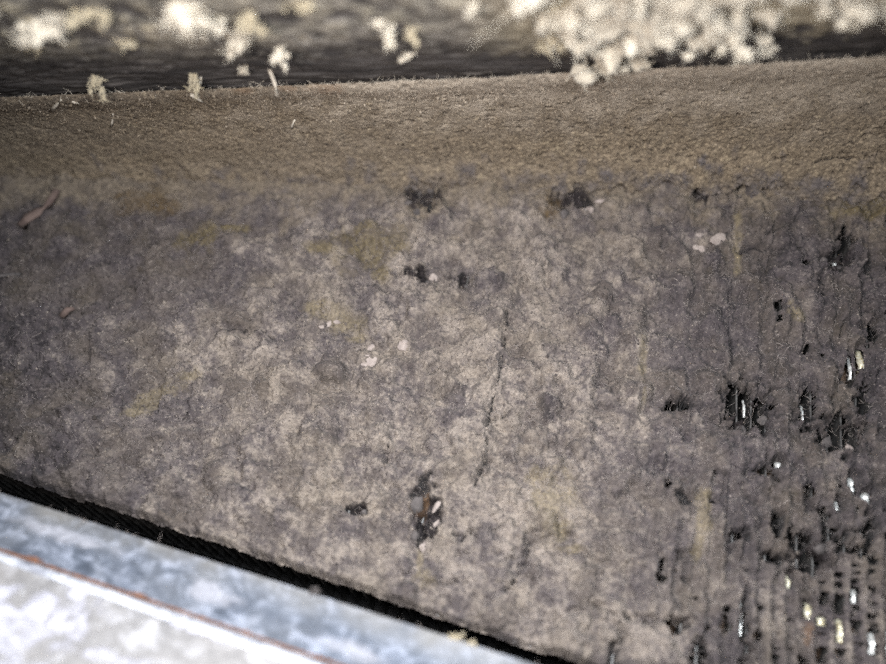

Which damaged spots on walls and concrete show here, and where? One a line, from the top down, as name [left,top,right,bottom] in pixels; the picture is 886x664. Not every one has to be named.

crack [474,313,508,485]
crack [676,395,696,412]